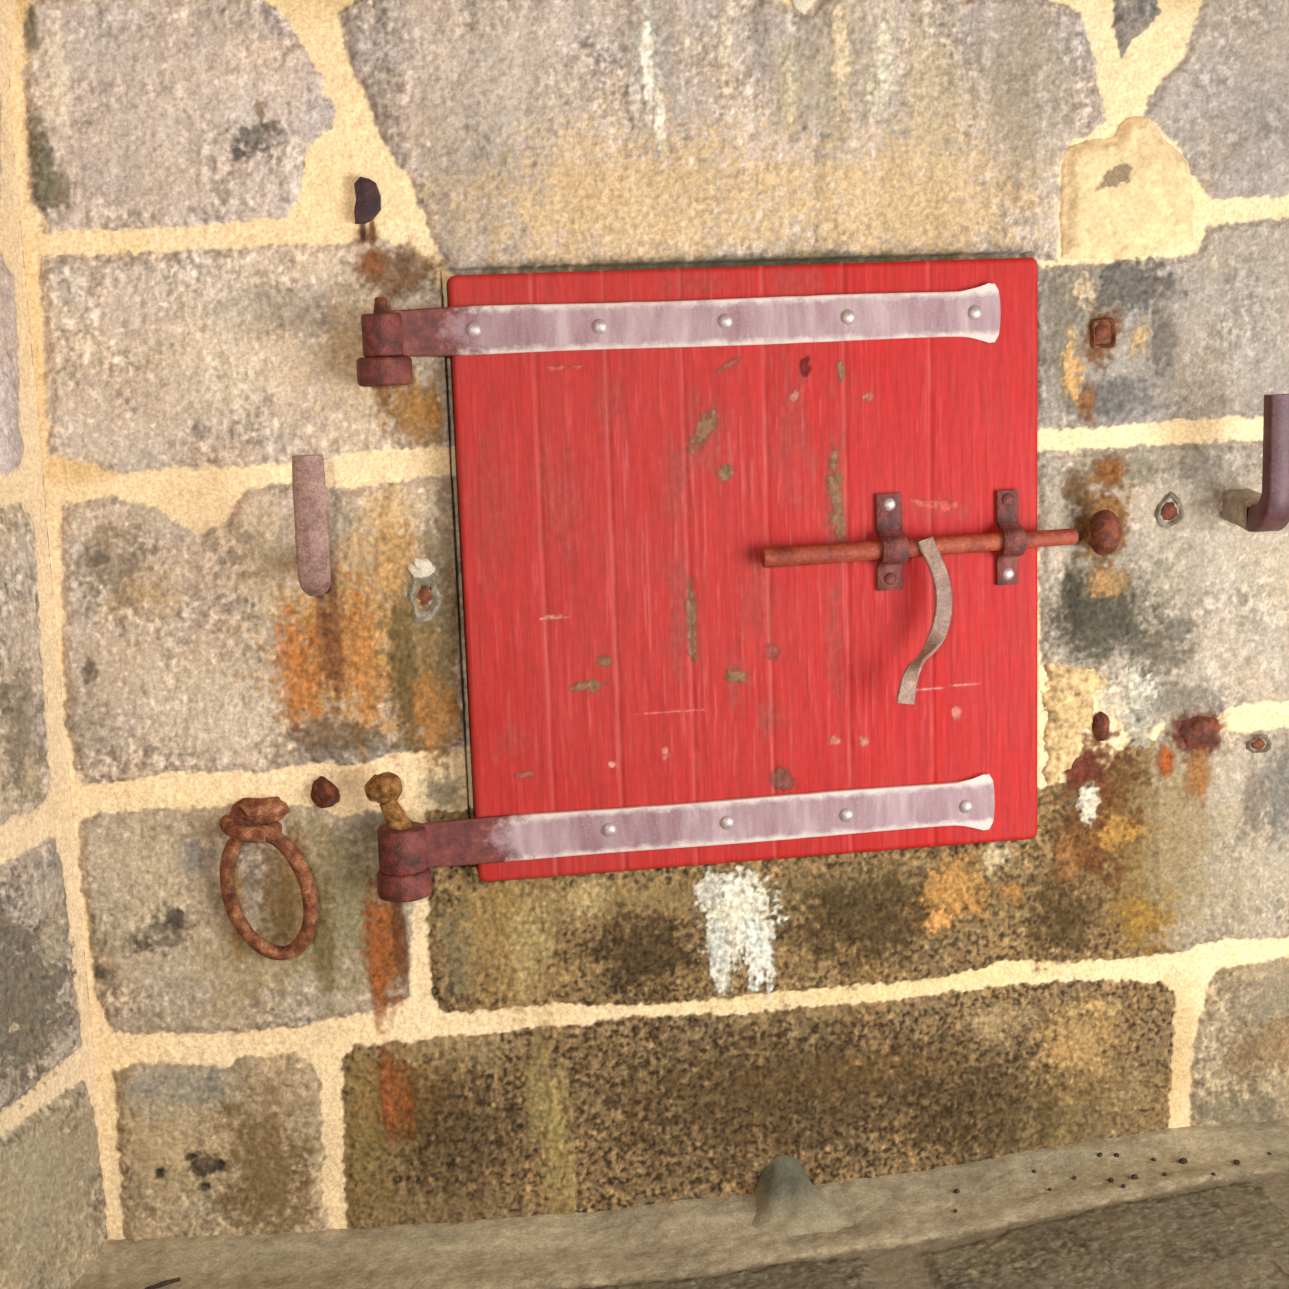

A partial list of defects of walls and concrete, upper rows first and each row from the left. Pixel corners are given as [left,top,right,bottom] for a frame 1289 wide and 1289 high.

rust [356,220,443,299]
rust [376,375,442,446]
rust [1061,271,1149,422]
rust [1062,457,1130,597]
rust [243,493,461,771]
rust [1160,711,1224,801]
rust [1042,732,1173,956]
rust [362,891,410,1030]
water stain [1026,886,1098,954]
water stain [492,866,933,1215]